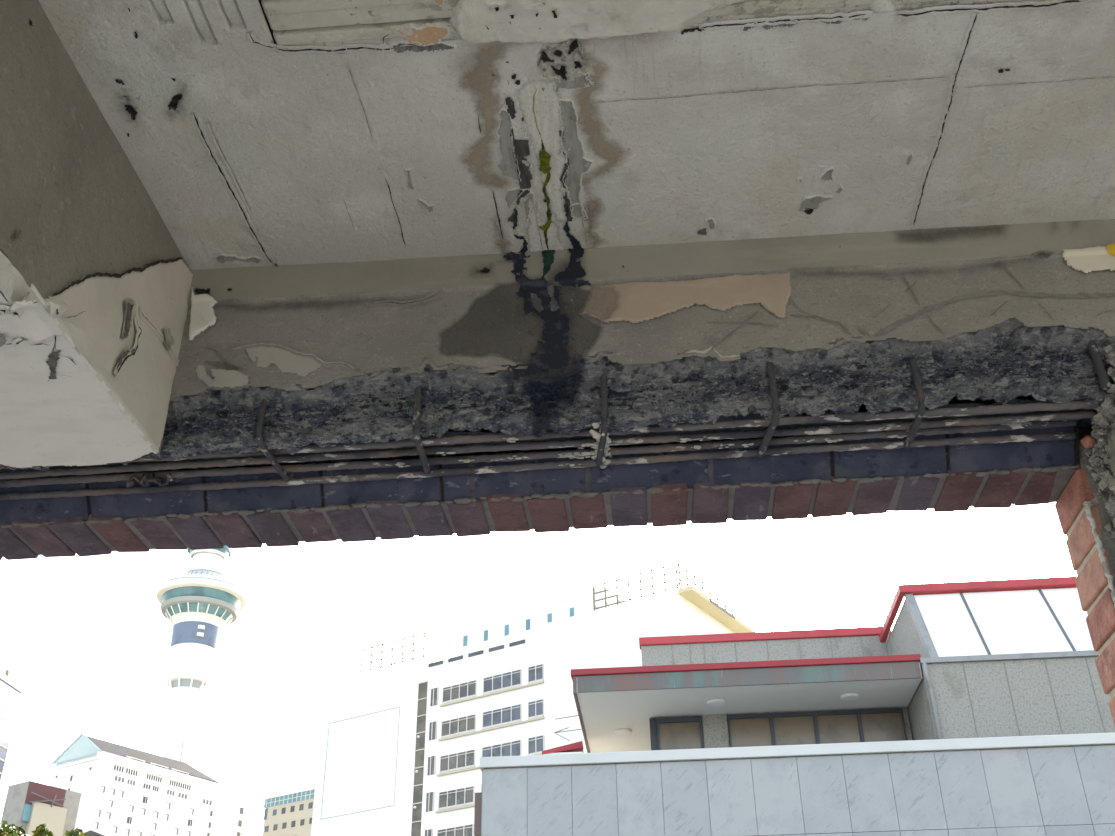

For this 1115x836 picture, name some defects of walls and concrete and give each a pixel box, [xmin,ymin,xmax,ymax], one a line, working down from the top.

damp [462,44,506,187]
damp [576,39,622,184]
crack [596,0,1115,226]
peeling [0,299,37,318]
crack [52,257,183,297]
crack [190,113,278,267]
damp [440,80,601,376]
peeling [583,272,792,323]
peeling [1062,244,1115,273]
spalling [0,318,1115,480]